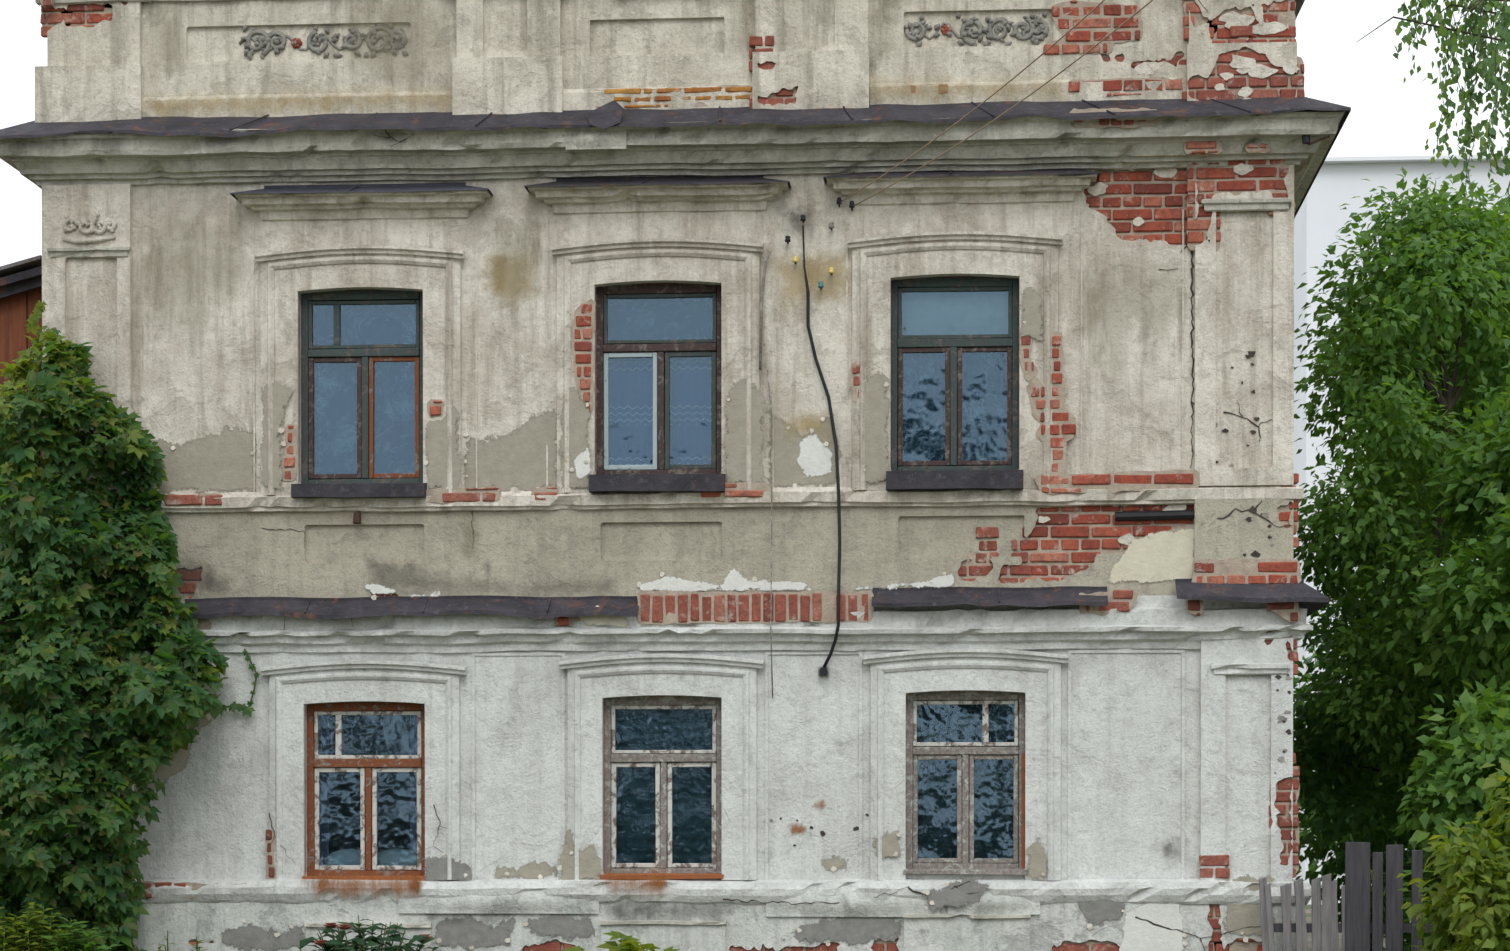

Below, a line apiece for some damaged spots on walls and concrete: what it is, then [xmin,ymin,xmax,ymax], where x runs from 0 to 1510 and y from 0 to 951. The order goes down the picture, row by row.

flaking render [40,0,128,38]
flaking render [1043,0,1305,129]
flaking render [1084,141,1296,252]
peeling [424,299,597,504]
peeling [701,378,842,498]
flaking render [929,287,1200,584]
flaking render [636,572,874,625]
flaking render [1079,589,1138,616]
flaking render [1185,473,1301,616]
flaking render [1199,602,1301,951]
peeling [435,914,595,951]
peeling [729,917,902,951]